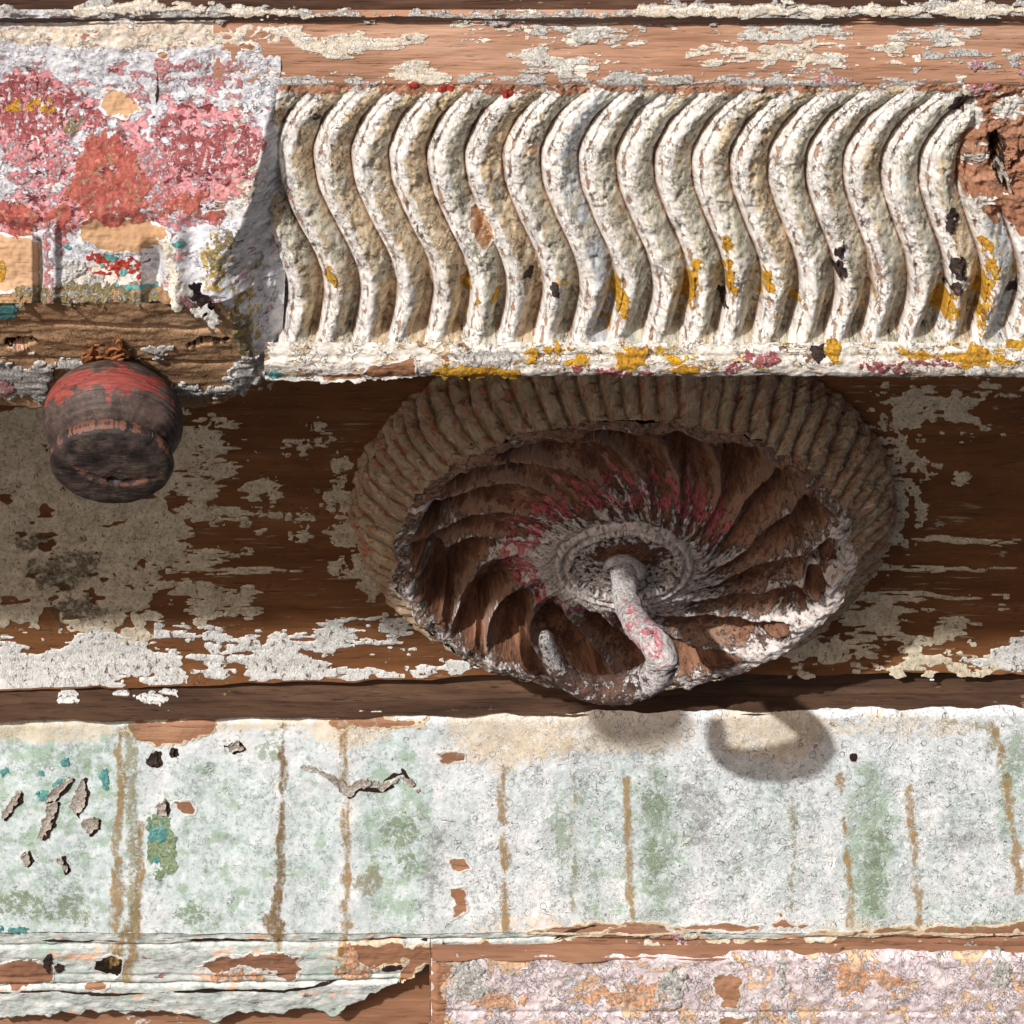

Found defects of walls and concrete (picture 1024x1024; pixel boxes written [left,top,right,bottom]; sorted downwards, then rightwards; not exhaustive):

peeling [0,0,1024,167]
peeling [0,194,251,329]
peeling [0,346,477,768]
peeling [782,592,1024,681]
damp [0,886,89,924]
peeling [1,757,109,841]
damp [122,724,143,938]
crack [300,764,420,799]
damp [378,816,420,873]
damp [639,749,680,929]
damp [849,762,893,919]
peeling [0,953,65,994]